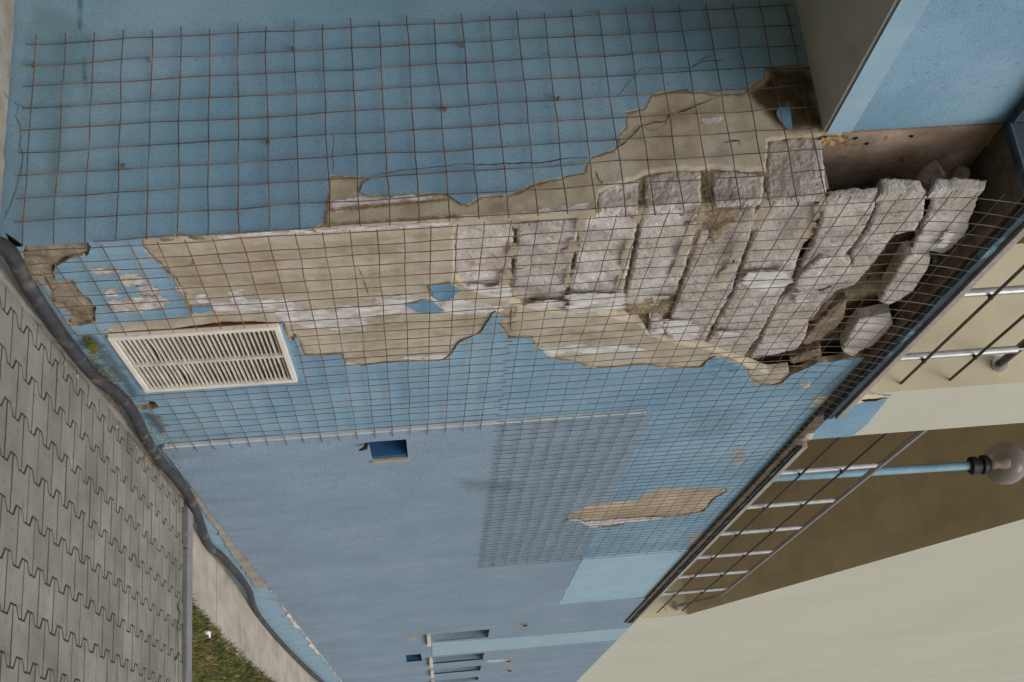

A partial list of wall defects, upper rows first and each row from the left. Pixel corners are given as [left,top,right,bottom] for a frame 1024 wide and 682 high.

leakage [753,71,821,128]
crack [375,96,720,183]
rust [324,199,448,225]
flaking render [7,67,1003,385]
rust [175,321,285,329]
peeling [567,487,727,526]